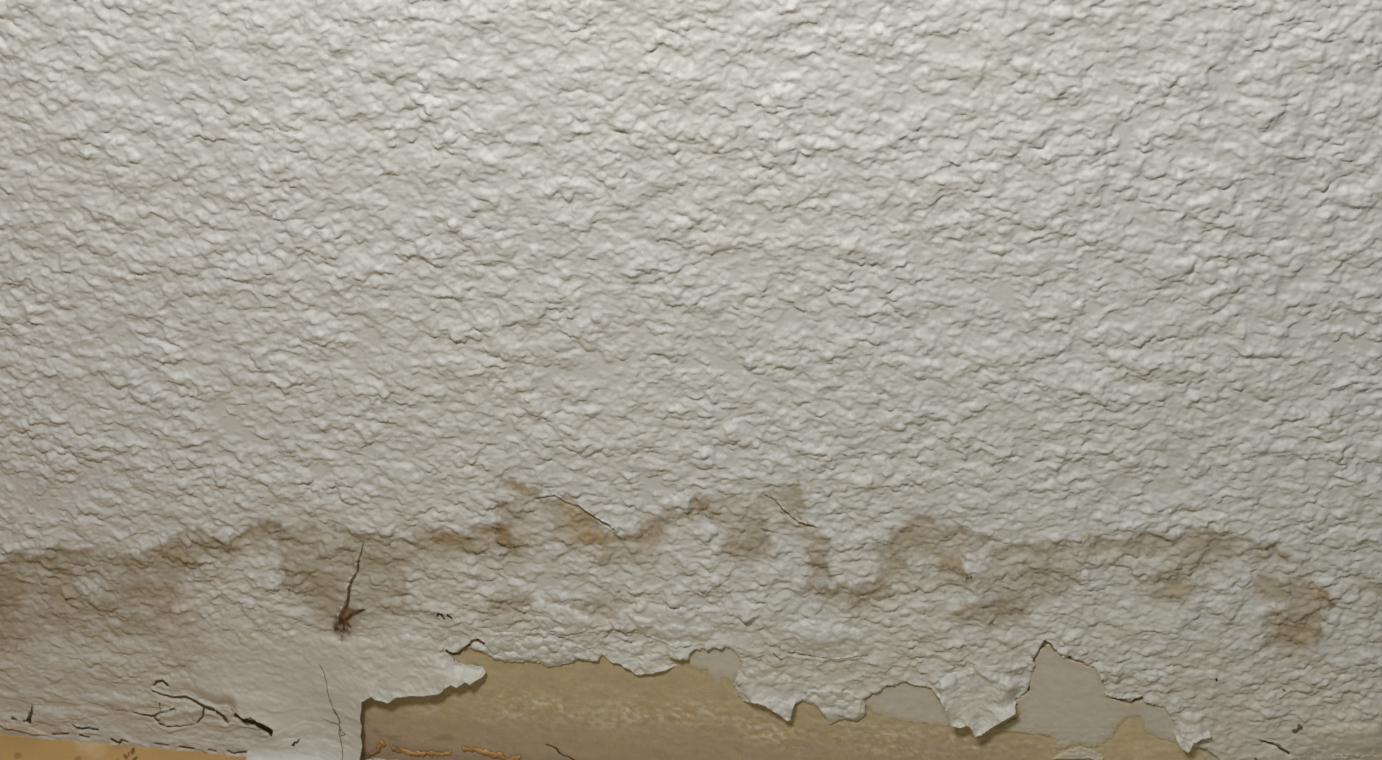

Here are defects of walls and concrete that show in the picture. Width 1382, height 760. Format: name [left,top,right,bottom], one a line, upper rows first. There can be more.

crack [337,543,365,633]
crack [1,664,346,760]
peeling [177,630,1219,760]